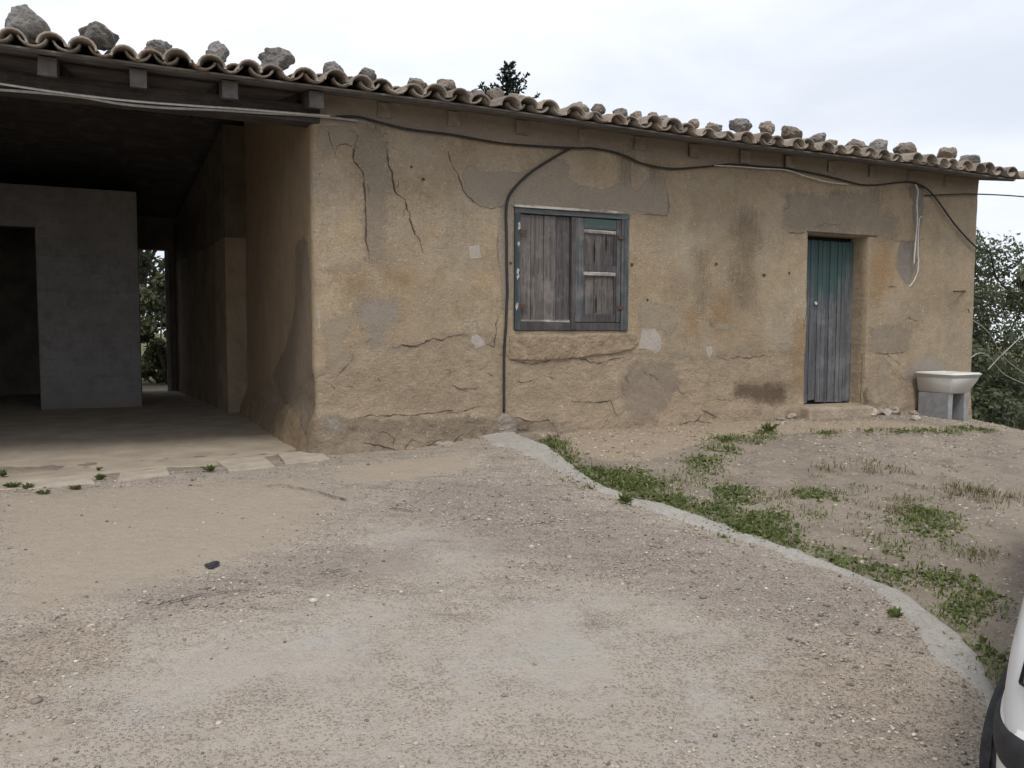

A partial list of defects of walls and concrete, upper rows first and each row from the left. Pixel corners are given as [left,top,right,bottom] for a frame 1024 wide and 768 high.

crack [328,131,424,258]
spalling [462,158,669,310]
crack [395,334,459,348]
peeling [639,328,662,354]
crack [349,356,730,450]
water stain [735,385,783,404]